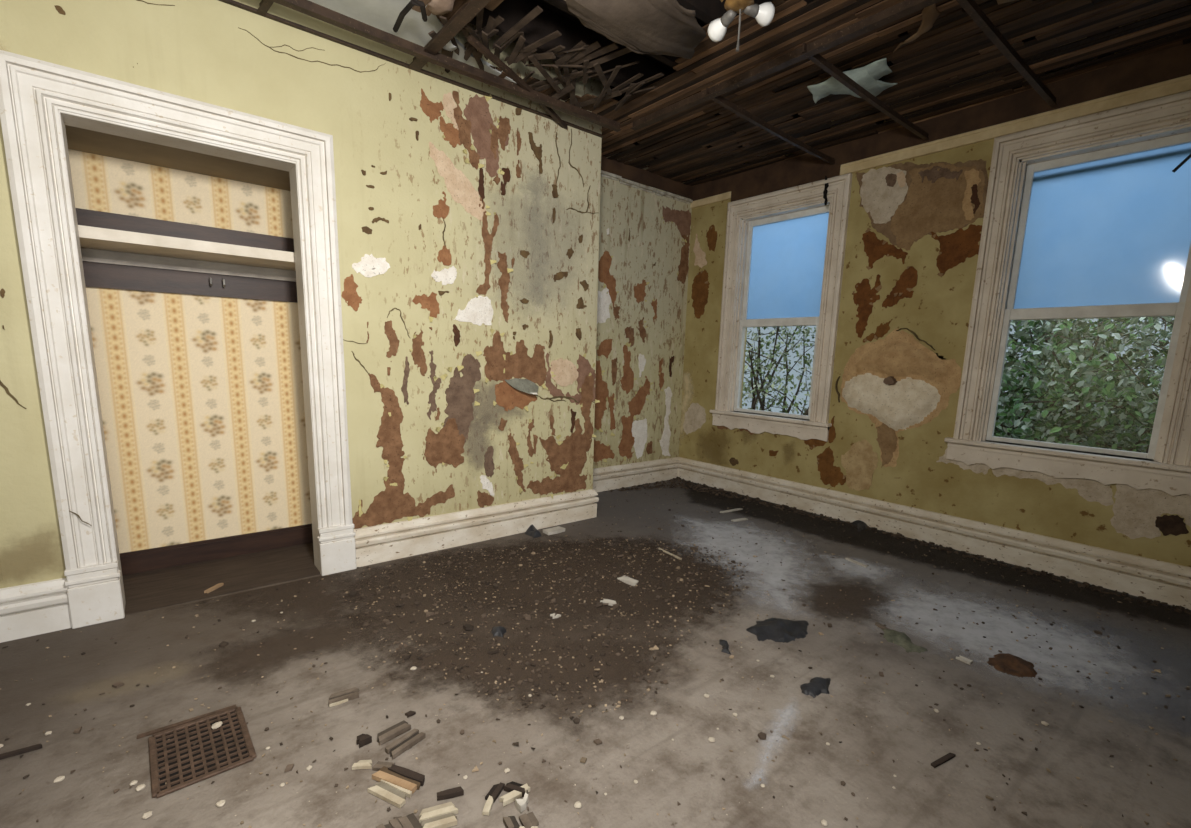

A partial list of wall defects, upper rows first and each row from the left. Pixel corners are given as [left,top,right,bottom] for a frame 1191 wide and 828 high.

crack [238,27,386,73]
spalling [341,254,390,311]
peeling [352,88,755,529]
spalling [852,159,989,343]
peeling [804,416,898,491]
spalling [936,447,1191,539]